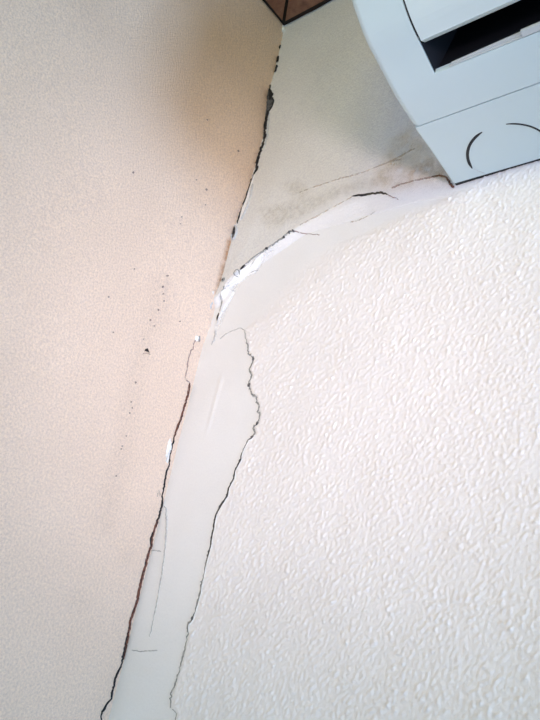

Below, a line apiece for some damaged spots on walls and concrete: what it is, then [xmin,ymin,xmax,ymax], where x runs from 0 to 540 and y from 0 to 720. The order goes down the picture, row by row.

flaking render [230,174,255,241]
crack [237,45,281,223]
crack [220,174,454,309]
crack [299,149,412,193]
flaking render [210,250,270,324]